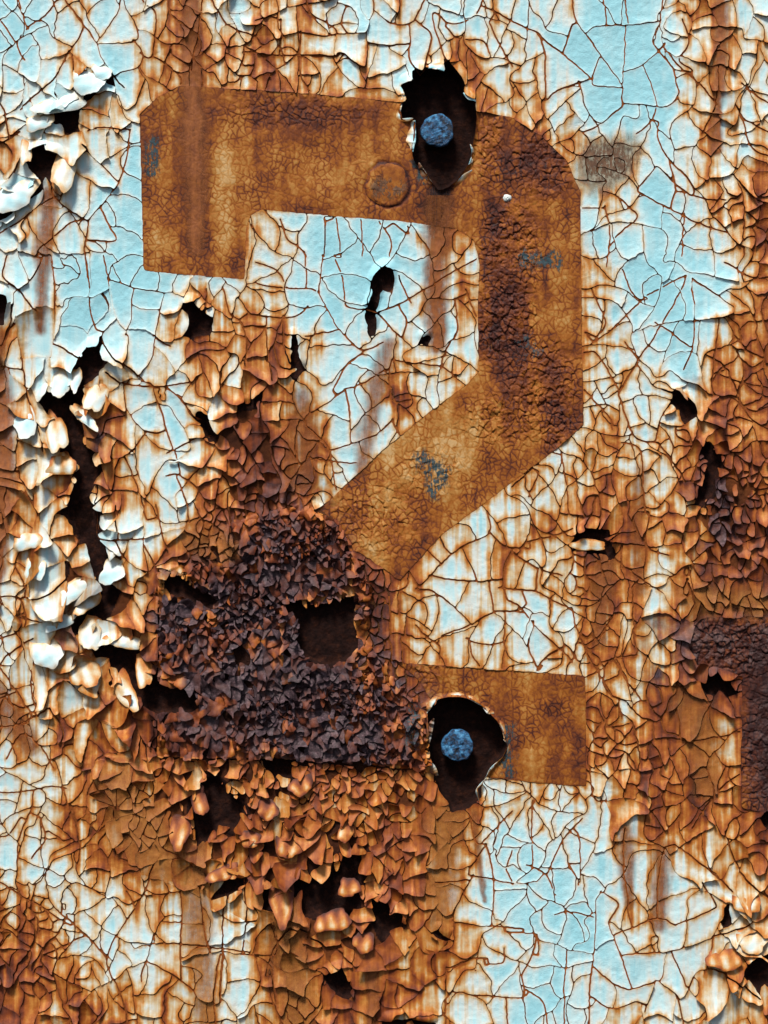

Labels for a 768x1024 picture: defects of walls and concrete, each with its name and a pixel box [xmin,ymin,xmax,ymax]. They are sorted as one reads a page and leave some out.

peeling [0,45,145,243]
peeling [193,5,477,190]
crack [0,0,768,280]
rust [711,0,728,155]
spalling [360,261,401,340]
spalling [0,286,507,1024]
crack [0,126,583,1024]
crack [384,268,768,1024]
peeling [585,362,768,854]
rust [106,767,178,879]
rust [185,839,214,1024]
rust [621,824,633,907]